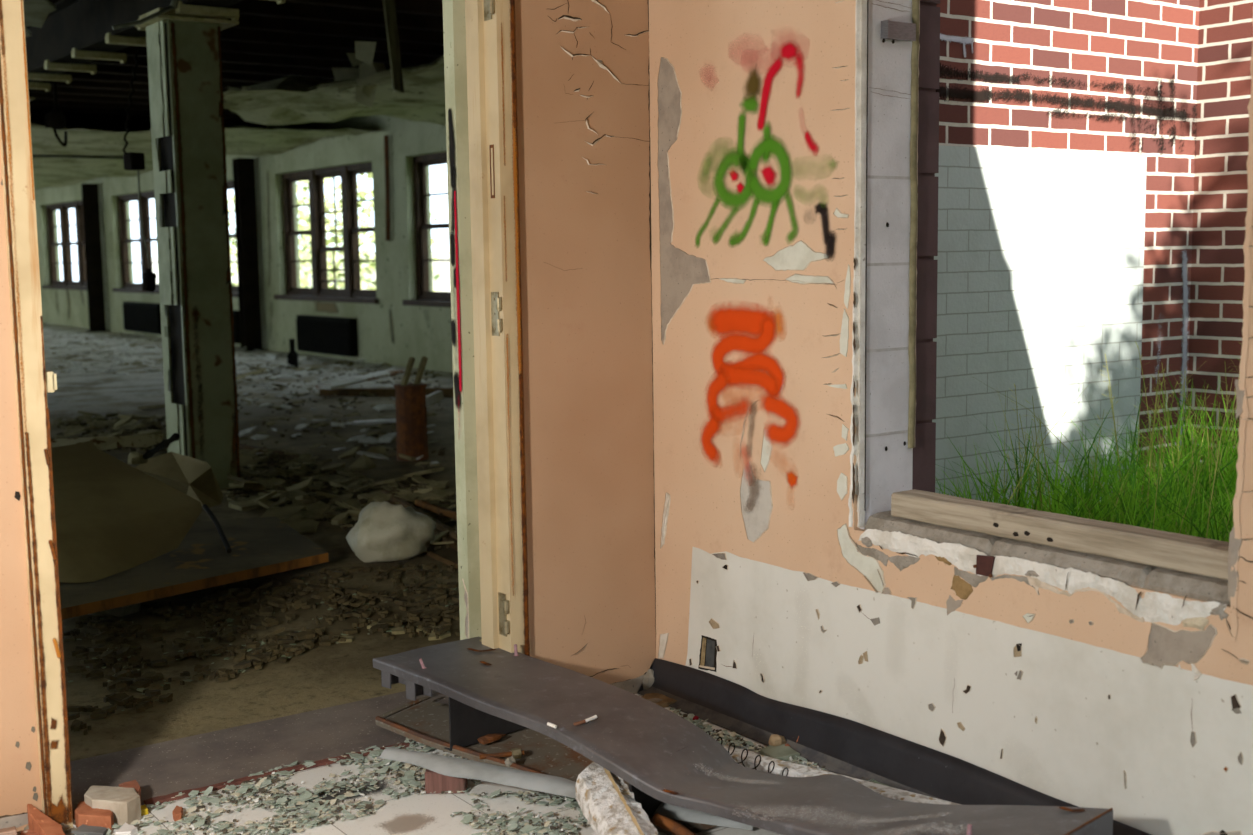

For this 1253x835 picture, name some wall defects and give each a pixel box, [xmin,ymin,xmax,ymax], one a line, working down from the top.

peeling [332,41,386,98]
crack [548,0,656,644]
peeling [657,57,746,345]
spalling [763,0,1253,681]
peeling [0,786,42,829]